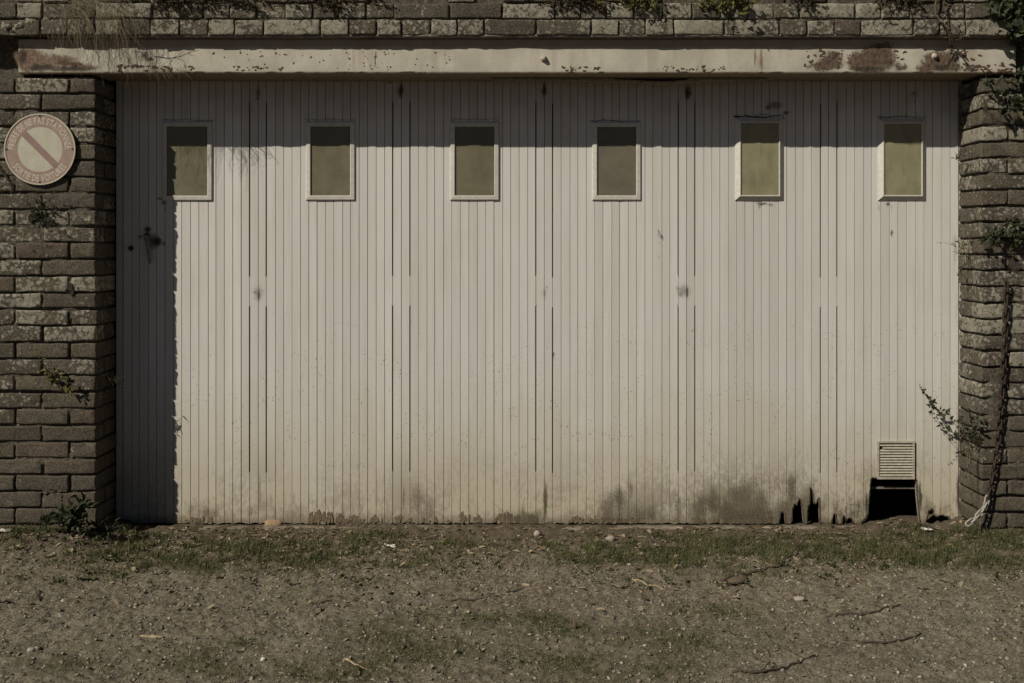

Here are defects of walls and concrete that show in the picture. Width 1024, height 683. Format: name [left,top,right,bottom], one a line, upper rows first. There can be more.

corrosion [808,42,978,74]
leakage [516,491,546,524]
leakage [692,477,821,524]